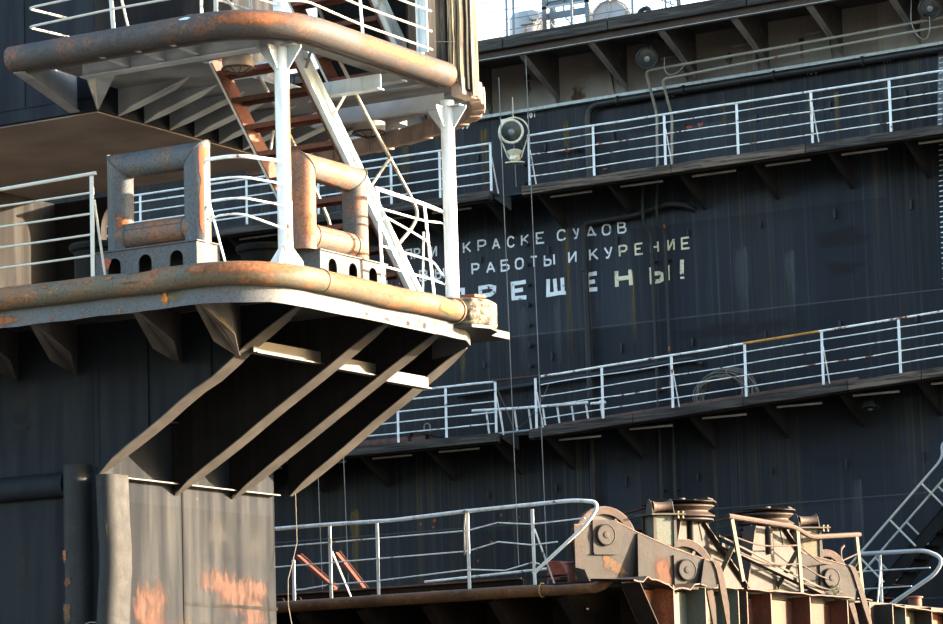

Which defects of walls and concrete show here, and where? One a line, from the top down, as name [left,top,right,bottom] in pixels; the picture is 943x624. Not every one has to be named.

rust [214,11,287,25]
rust [116,215,128,228]
rust [306,215,314,238]
rust [339,275,413,298]
rust [0,314,18,325]
rust [603,555,627,576]
rust [656,559,671,585]
rust [63,604,71,624]
rust [135,586,165,624]
rust [202,571,265,624]